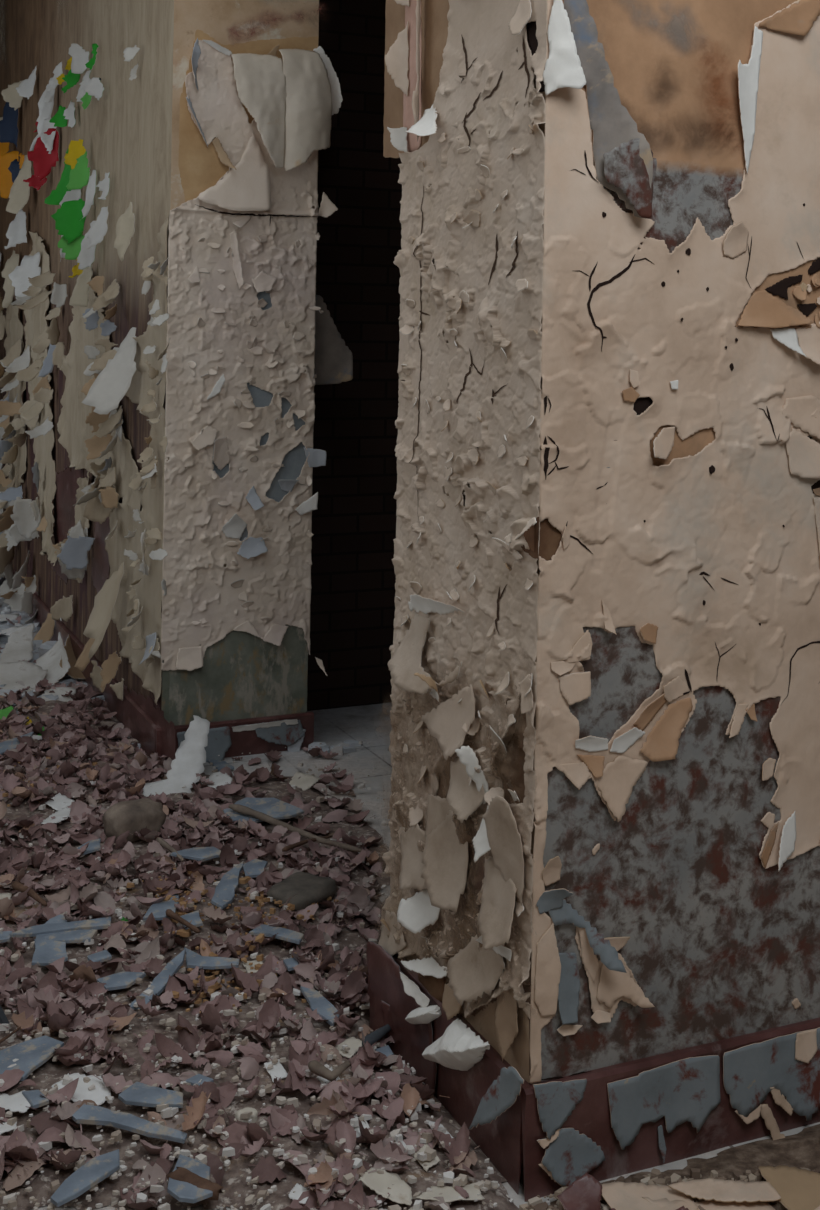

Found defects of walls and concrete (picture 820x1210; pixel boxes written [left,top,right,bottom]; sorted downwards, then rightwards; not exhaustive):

peeling [508,0,820,258]
peeling [178,30,343,368]
crack [577,255,652,351]
flaking render [725,257,820,365]
peeling [0,254,327,797]
peeling [468,517,570,571]
peeling [650,425,715,466]
peeling [782,395,820,566]
crack [781,641,820,704]
peeling [358,575,820,1210]
peeling [0,1090,31,1113]
peeling [51,1073,111,1106]